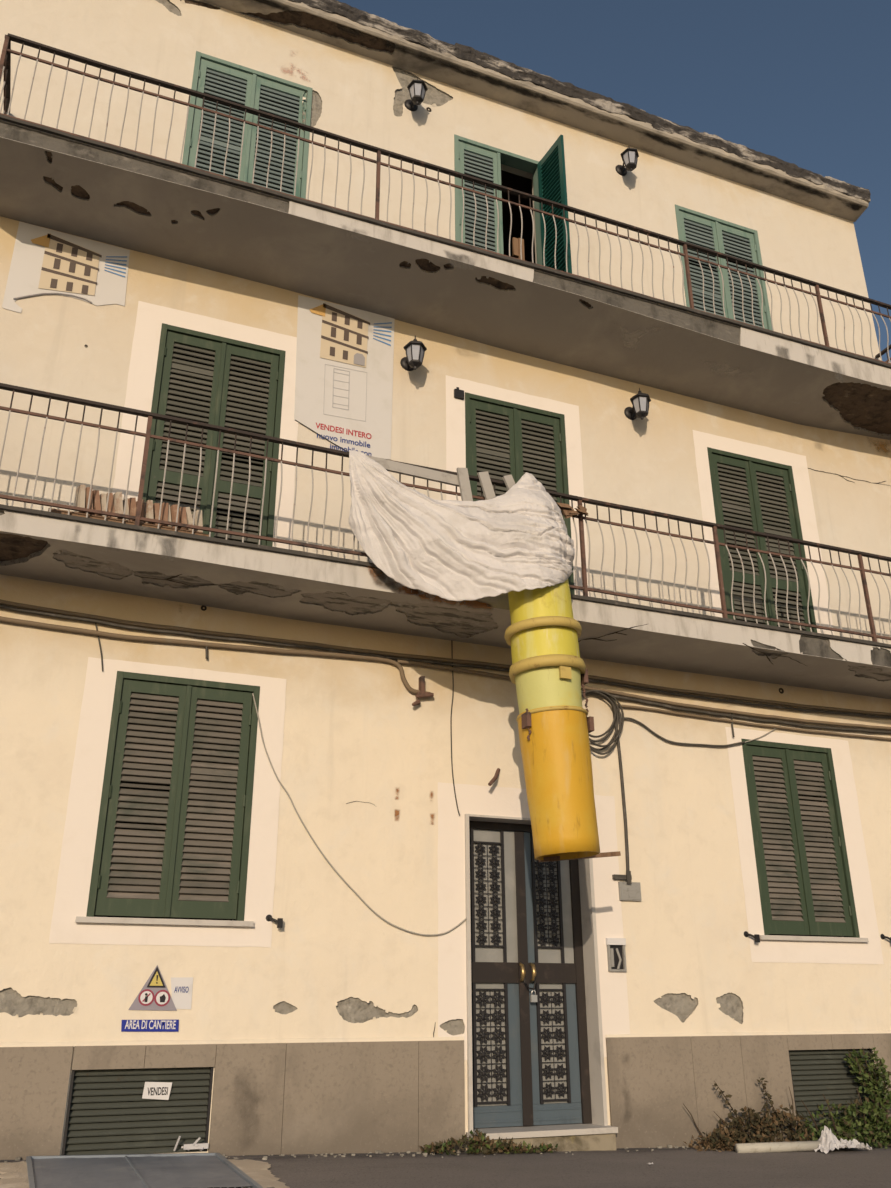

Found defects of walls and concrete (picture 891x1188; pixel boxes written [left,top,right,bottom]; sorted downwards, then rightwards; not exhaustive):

flaking render [156,0,221,16]
spalling [239,11,453,117]
flaking render [0,120,289,220]
spalling [822,382,891,437]
flaking render [0,533,392,616]
flaking render [751,635,891,681]
flaking render [0,987,79,1017]
flaking render [273,1001,298,1014]
flaking render [335,997,418,1023]
flaking render [654,993,698,1023]
flaking render [716,993,744,1024]
flaking render [440,1019,465,1036]